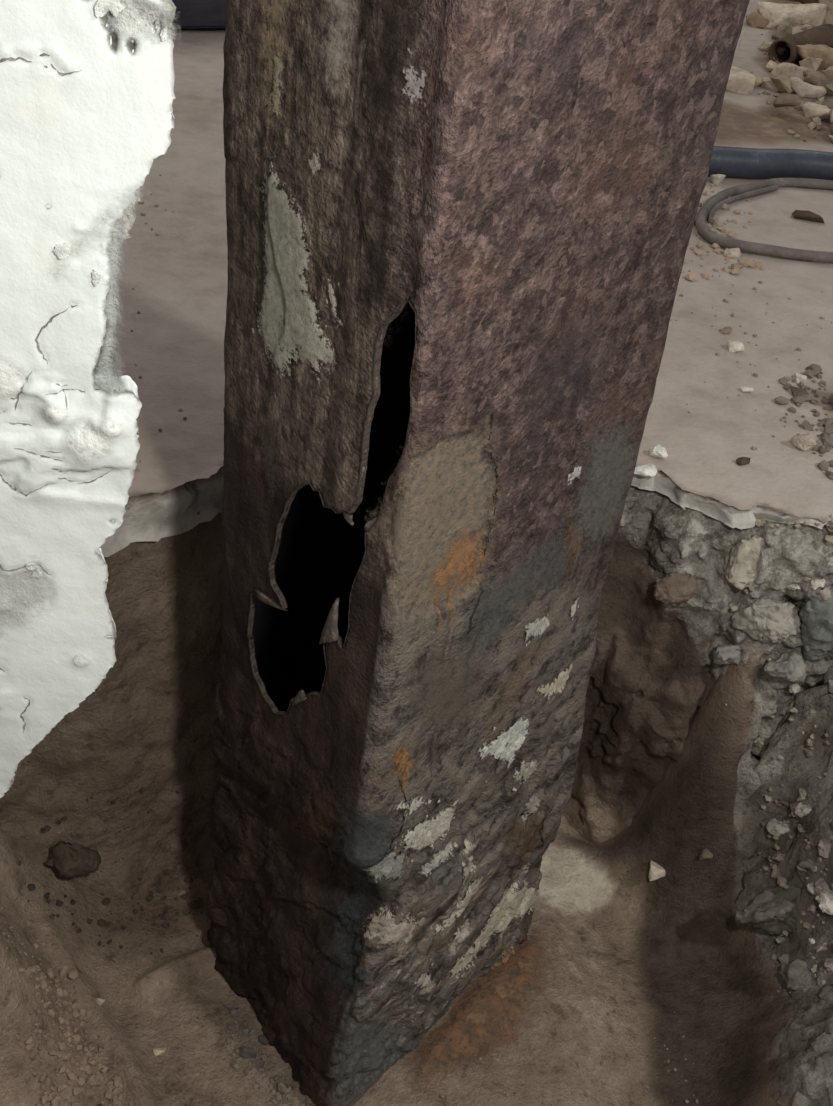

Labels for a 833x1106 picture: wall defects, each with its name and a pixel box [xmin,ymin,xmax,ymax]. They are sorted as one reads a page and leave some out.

crack [0,53,81,76]
crack [0,305,112,496]
peeling [343,513,377,532]
peeling [255,589,289,611]
peeling [319,598,340,644]
rust [432,533,484,631]
peeling [291,689,307,706]
rust [406,928,546,1083]